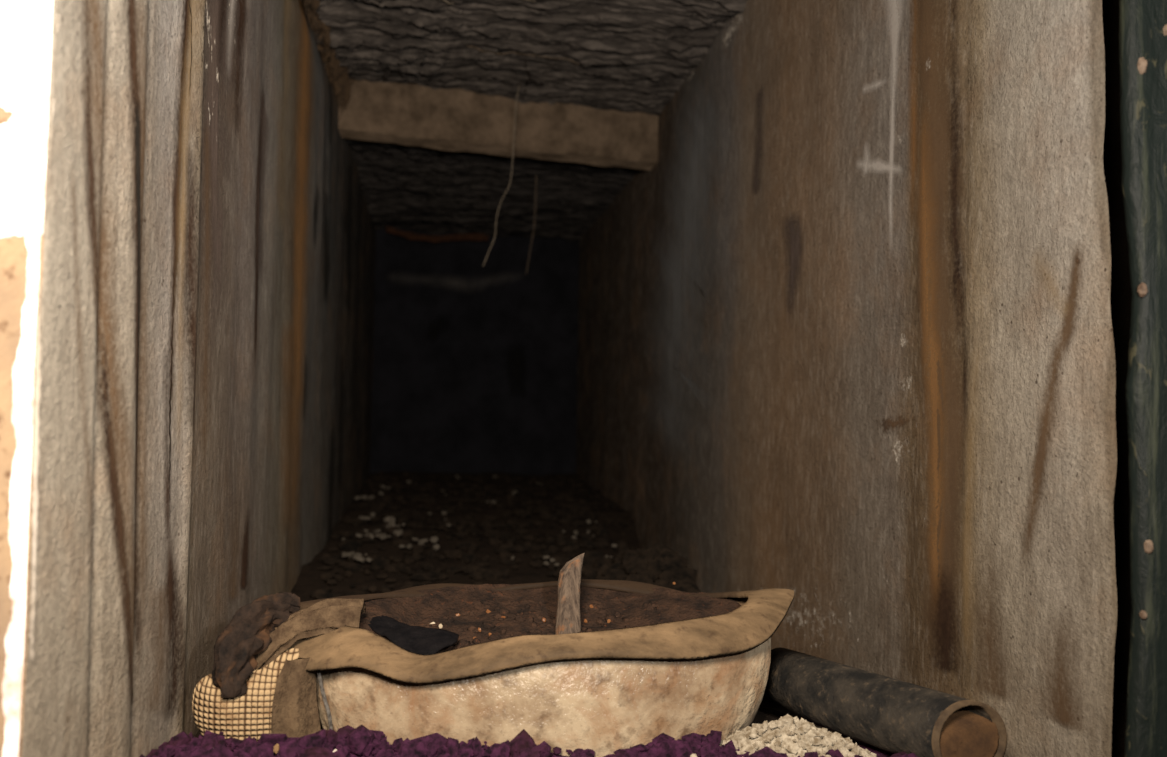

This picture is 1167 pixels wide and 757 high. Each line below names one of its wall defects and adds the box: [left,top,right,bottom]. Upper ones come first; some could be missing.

damp [85,0,145,687]
damp [186,0,245,390]
damp [1027,253,1080,547]
damp [157,552,184,709]